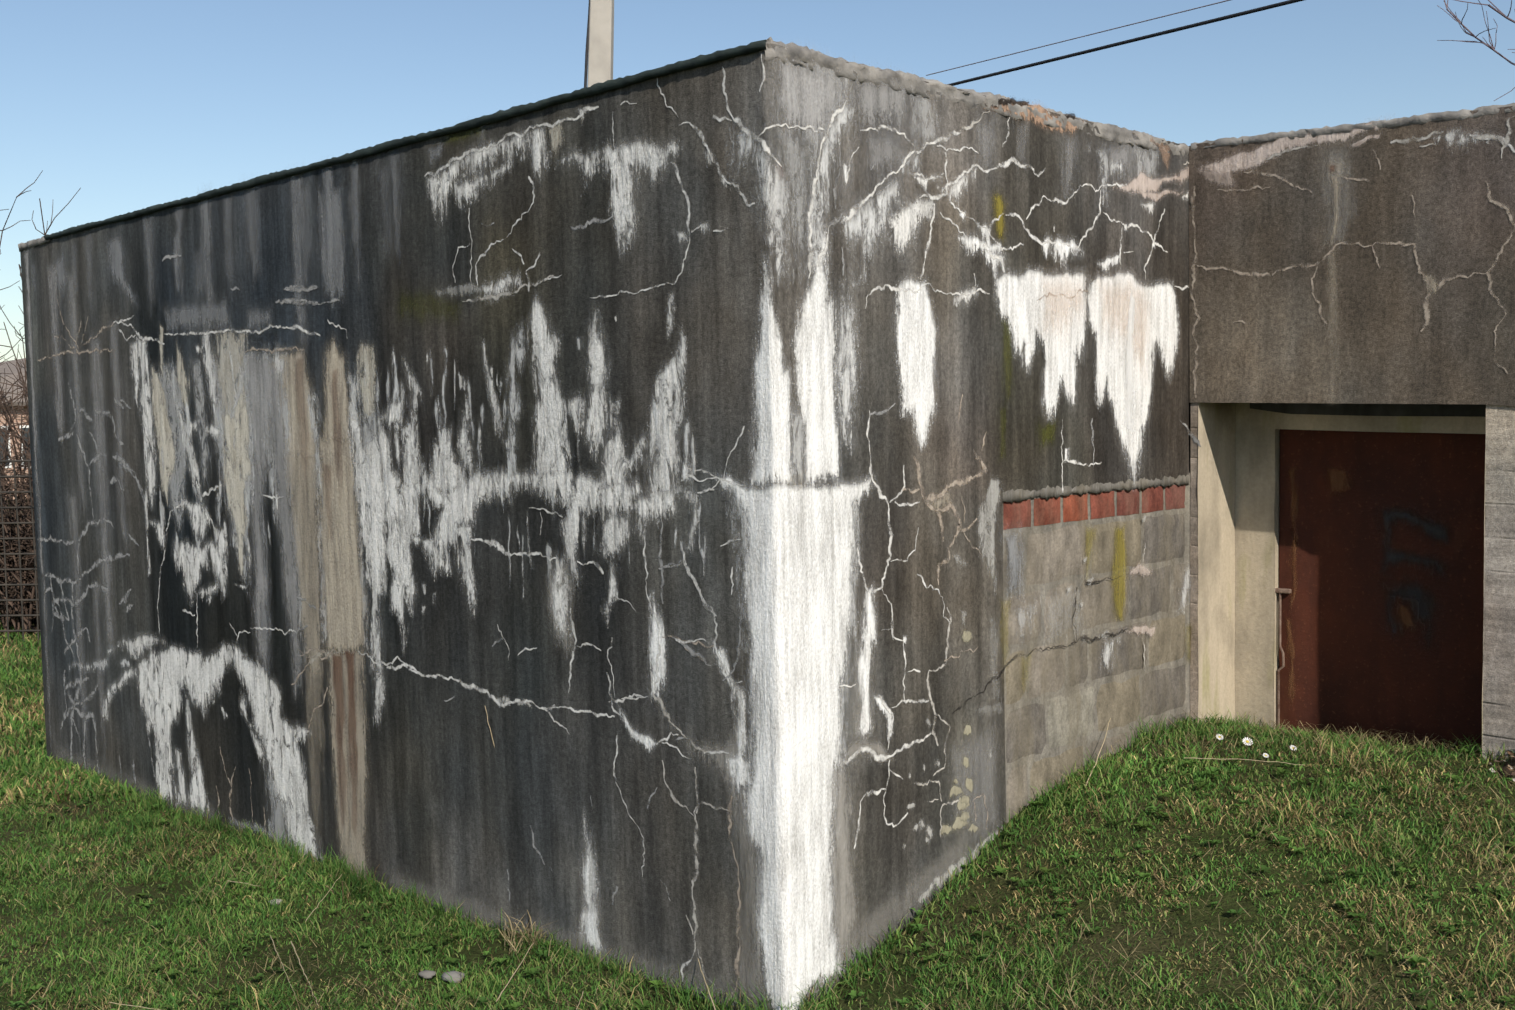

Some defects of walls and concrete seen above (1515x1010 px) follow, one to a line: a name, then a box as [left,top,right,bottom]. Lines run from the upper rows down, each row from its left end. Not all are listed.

leakage [26,253,38,483]
leakage [50,260,66,432]
crack [37,285,346,784]
crack [452,176,561,286]
crack [291,507,751,1008]
leakage [69,59,1043,1010]
crack [571,216,614,230]
crack [688,426,745,493]
crack [837,394,1145,849]
crack [590,54,1515,447]
leakage [995,269,1188,482]
leakage [1102,626,1155,666]